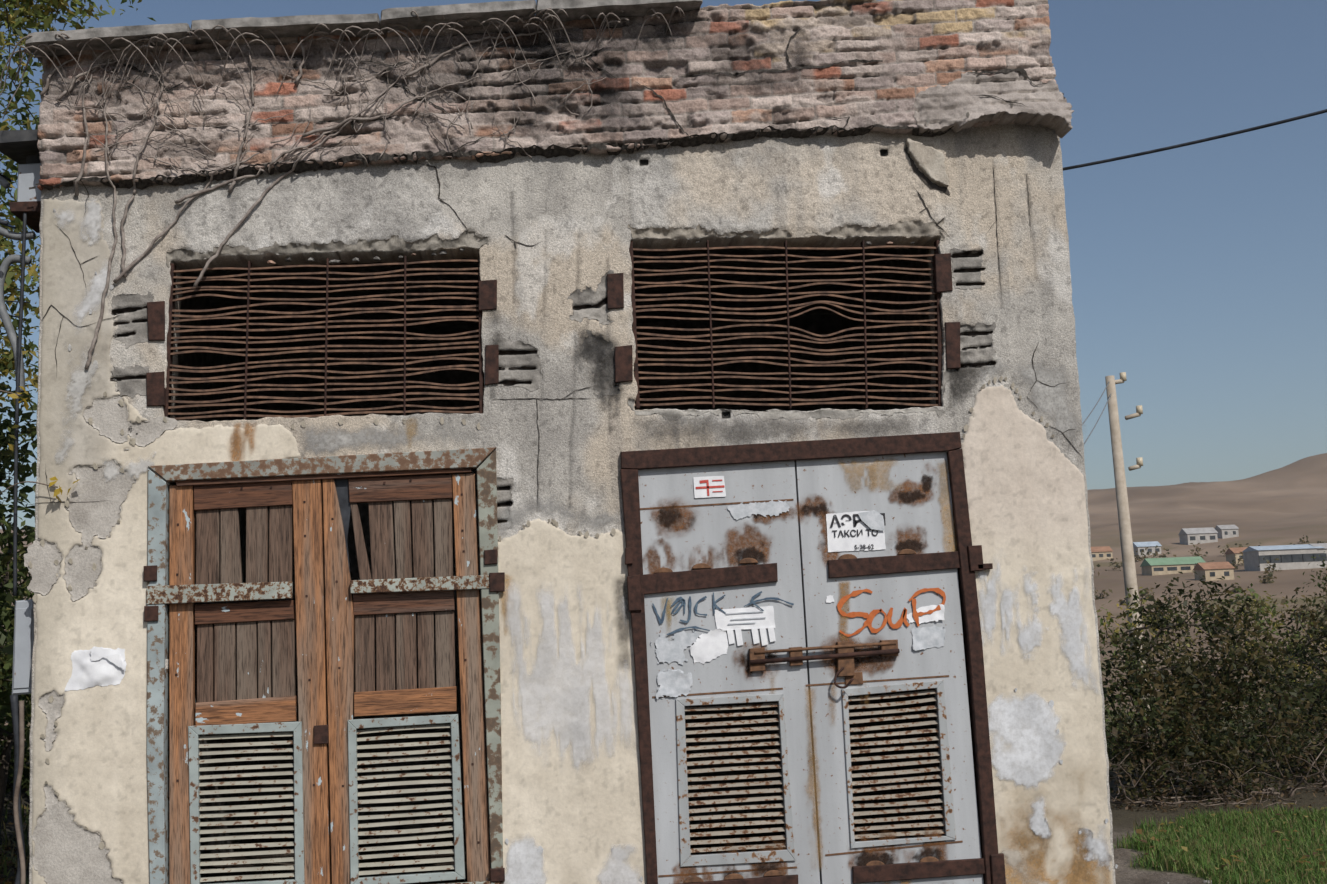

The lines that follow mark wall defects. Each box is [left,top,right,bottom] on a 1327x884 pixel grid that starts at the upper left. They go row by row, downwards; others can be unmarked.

crack [29,26,954,364]
spalling [78,267,154,348]
peeling [24,359,178,603]
rust [647,503,693,574]
rust [691,496,838,569]
peeling [508,589,631,766]
rust [741,646,775,676]
peeling [988,688,1064,837]
peeling [32,780,123,884]
peeling [504,838,546,884]
rust [673,846,787,884]
water stain [1005,825,1109,884]